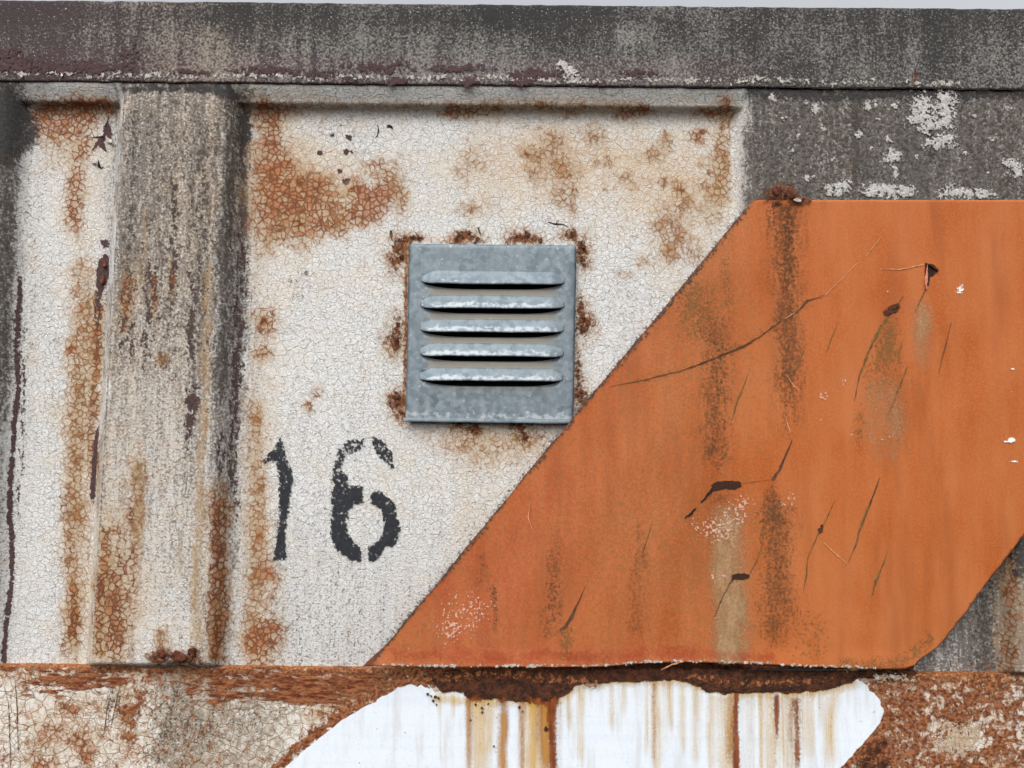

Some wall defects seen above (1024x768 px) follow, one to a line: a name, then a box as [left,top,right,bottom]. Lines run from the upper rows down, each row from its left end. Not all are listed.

rust [29,93,123,233]
rust [242,95,408,255]
rust [372,98,655,120]
leakage [749,88,1024,195]
leakage [118,92,252,408]
crack [613,262,862,386]
rust [0,227,1024,768]
peeling [374,208,757,668]
crack [685,488,713,518]
crack [715,546,762,615]
peeling [495,659,916,683]